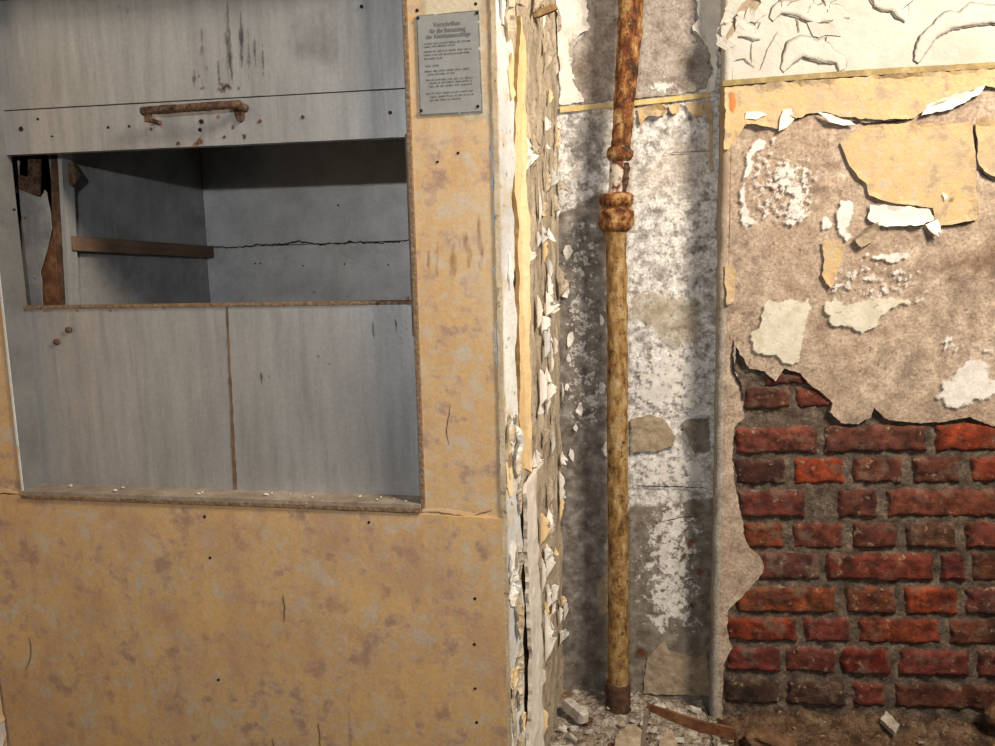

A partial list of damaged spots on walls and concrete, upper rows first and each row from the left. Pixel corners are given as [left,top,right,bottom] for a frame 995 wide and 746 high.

damp [218,6,264,77]
peeling [424,0,488,120]
crack [736,0,995,72]
rust [622,162,630,192]
peeling [635,0,995,288]
peeling [724,265,737,305]
peeling [500,0,618,746]
flaking render [630,414,675,453]
spalling [722,348,995,723]
flaking render [643,641,709,696]
peeling [0,715,8,746]